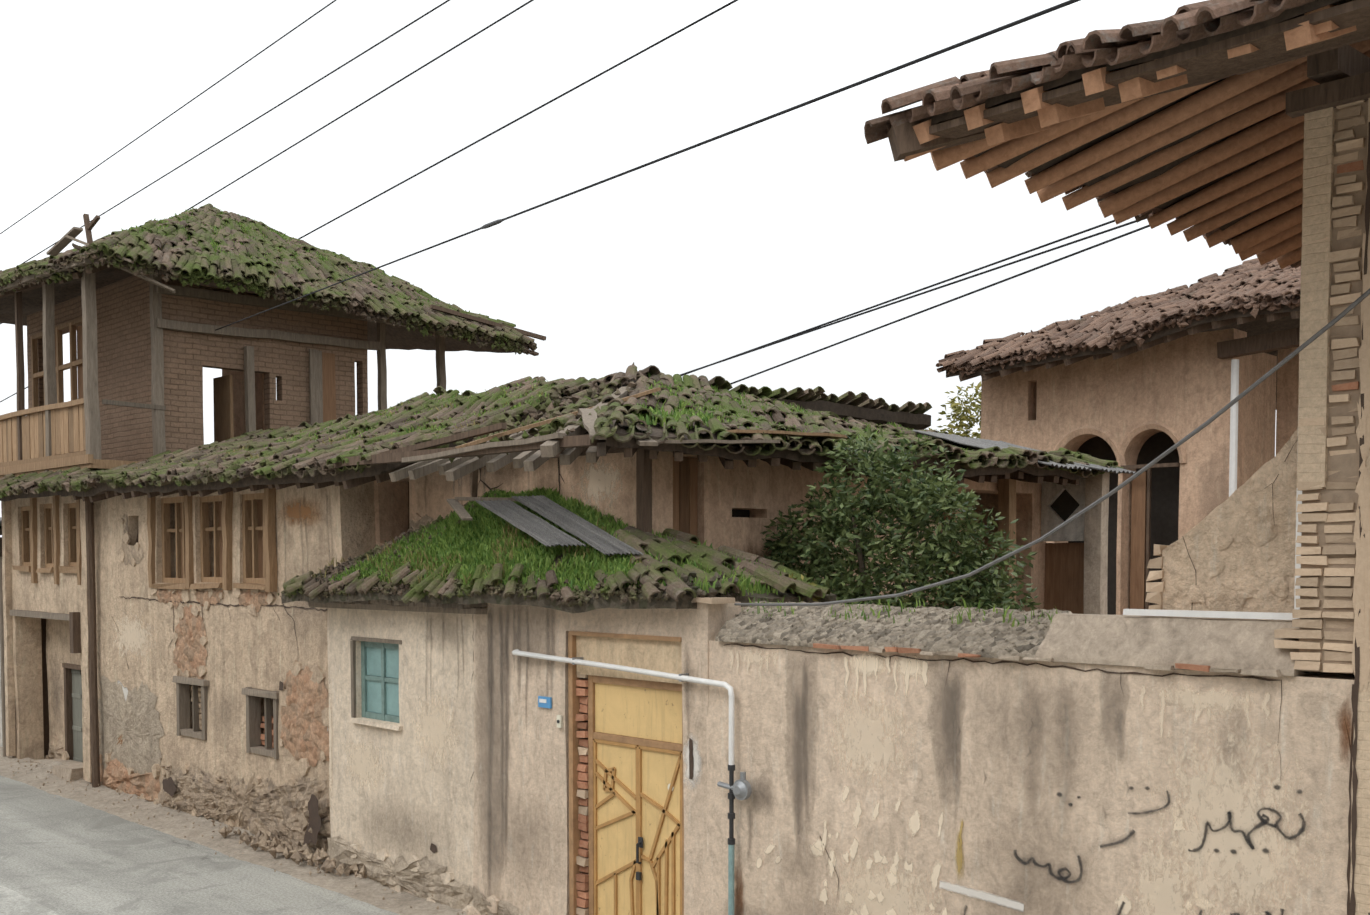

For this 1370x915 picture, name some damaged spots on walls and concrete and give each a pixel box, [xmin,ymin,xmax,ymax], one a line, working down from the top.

spalling [98,660,522,915]
spalling [810,786,954,915]